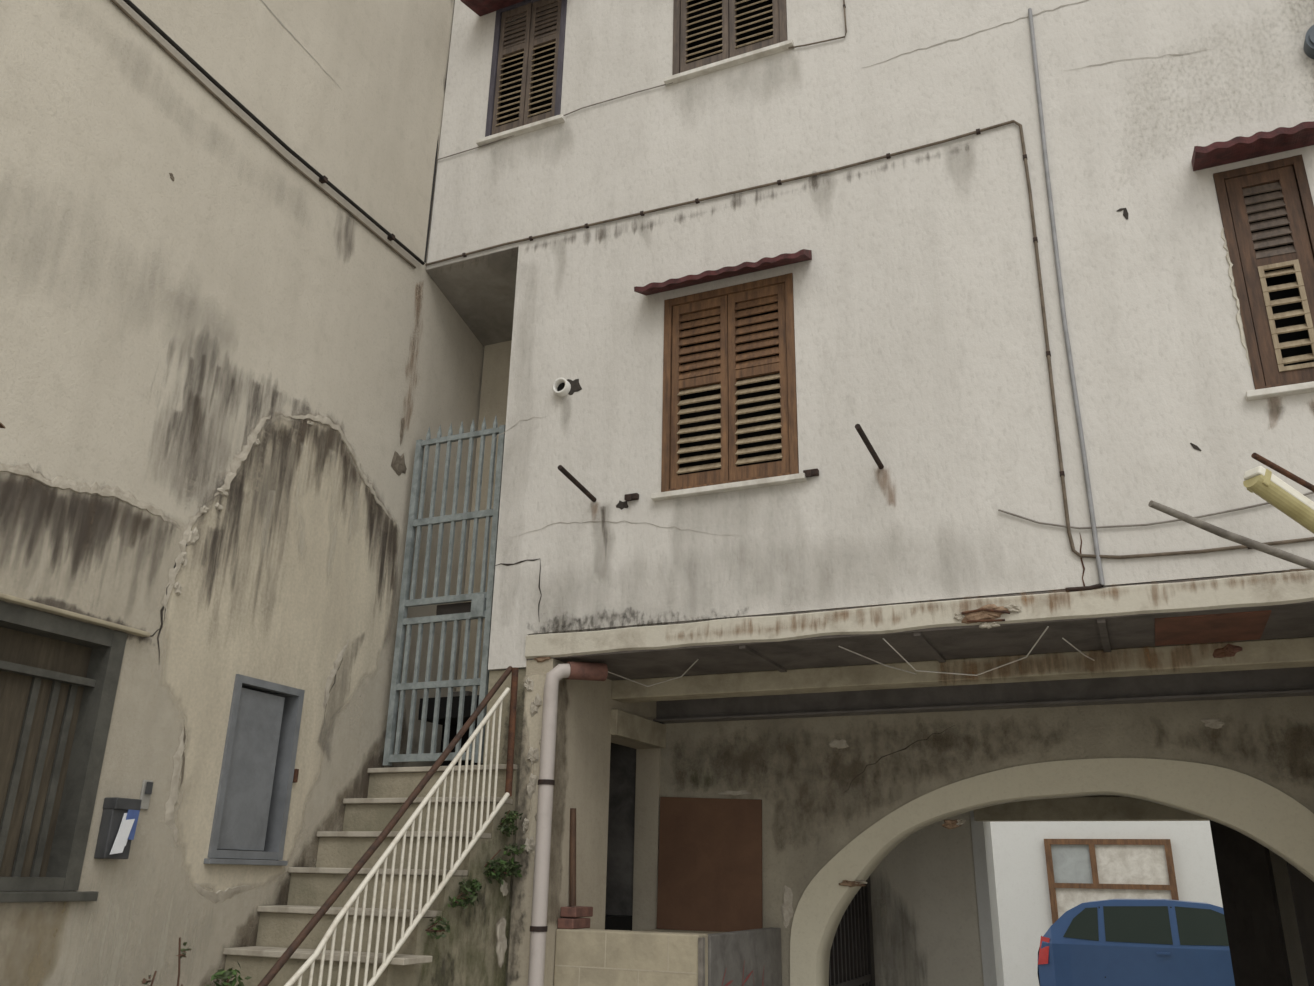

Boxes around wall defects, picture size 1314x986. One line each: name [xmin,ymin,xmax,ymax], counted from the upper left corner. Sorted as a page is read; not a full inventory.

water stain [189,337,215,480]
water stain [0,476,161,568]
water stain [208,419,397,600]
crack [149,528,192,665]
spalling [954,604,1022,629]
spalling [1213,643,1243,658]
crack [178,726,186,790]